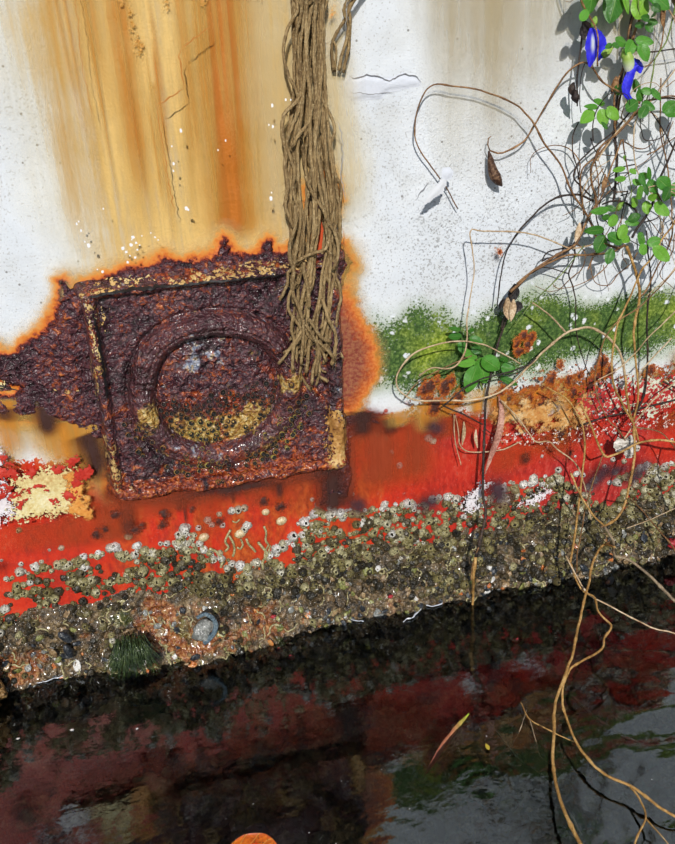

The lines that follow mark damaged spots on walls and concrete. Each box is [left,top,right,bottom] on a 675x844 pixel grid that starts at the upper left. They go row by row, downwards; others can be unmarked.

peeling [0,446,94,525]
rust [0,0,675,540]